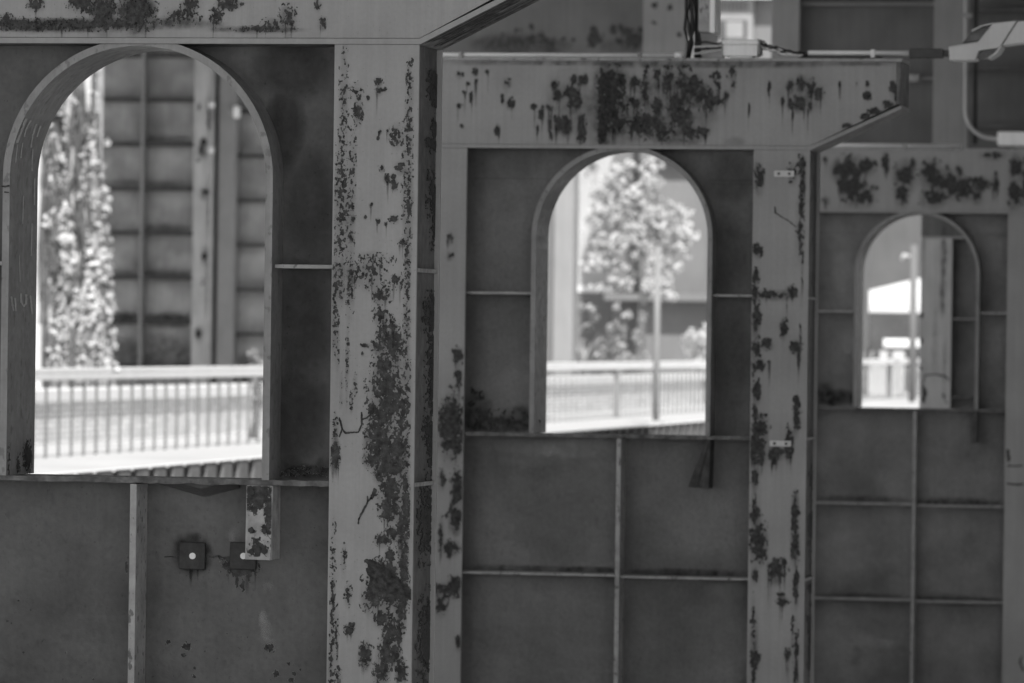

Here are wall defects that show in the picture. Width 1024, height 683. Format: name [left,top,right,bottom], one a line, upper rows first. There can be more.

corrosion [4,20,92,31]
corrosion [456,68,489,109]
corrosion [500,77,515,109]
corrosion [530,62,737,145]
corrosion [767,76,826,119]
corrosion [842,80,896,128]
corrosion [786,153,806,264]
corrosion [823,151,1024,206]
corrosion [280,46,414,478]
corrosion [748,242,804,683]
corrosion [177,486,272,592]
corrosion [328,521,355,683]